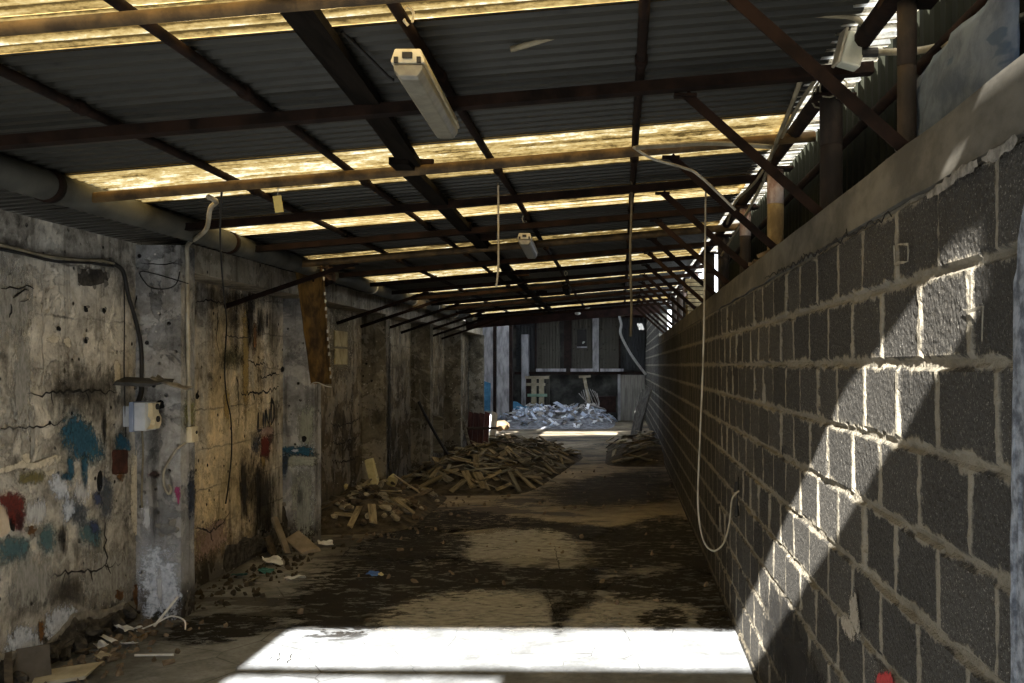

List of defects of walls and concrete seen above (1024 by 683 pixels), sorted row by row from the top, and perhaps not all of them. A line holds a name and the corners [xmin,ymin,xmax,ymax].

crack [1,261,117,430]
leakage [62,360,121,446]
crack [48,522,121,589]
leakage [4,455,735,653]